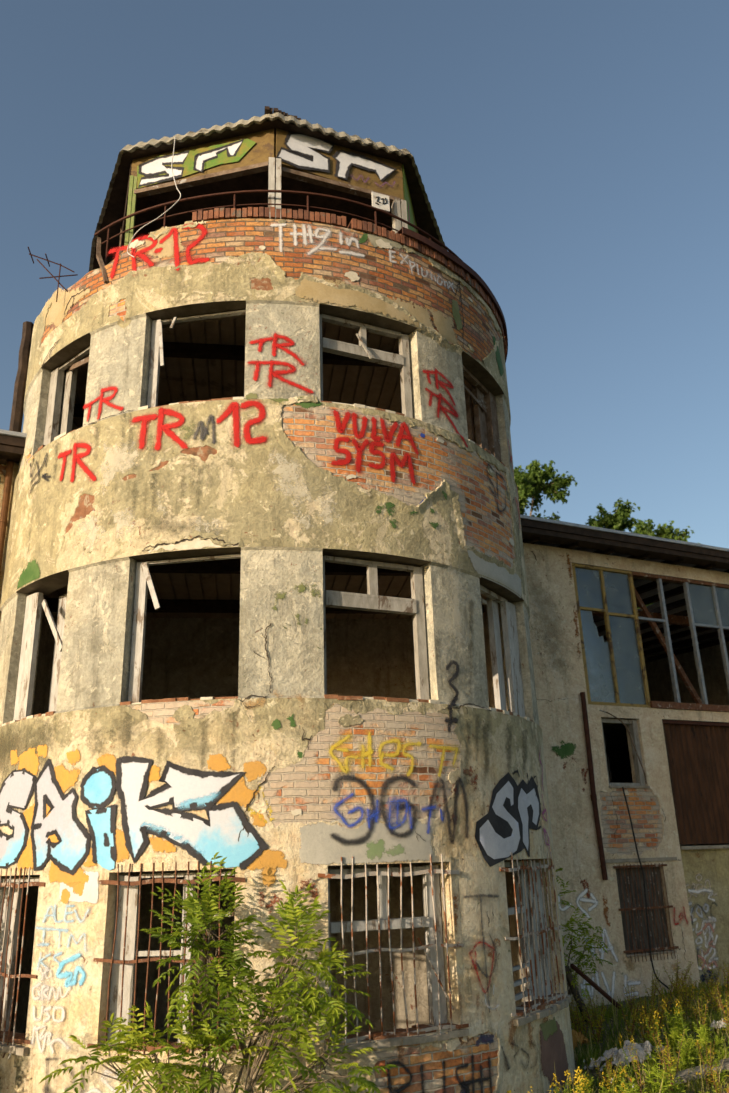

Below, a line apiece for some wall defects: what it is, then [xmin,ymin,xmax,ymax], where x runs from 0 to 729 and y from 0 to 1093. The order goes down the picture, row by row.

flaking render [37,219,504,376]
flaking render [271,395,522,598]
crack [238,623,272,708]
flaking render [248,701,467,865]
flaking render [595,783,668,859]
flaking render [360,1019,504,1093]